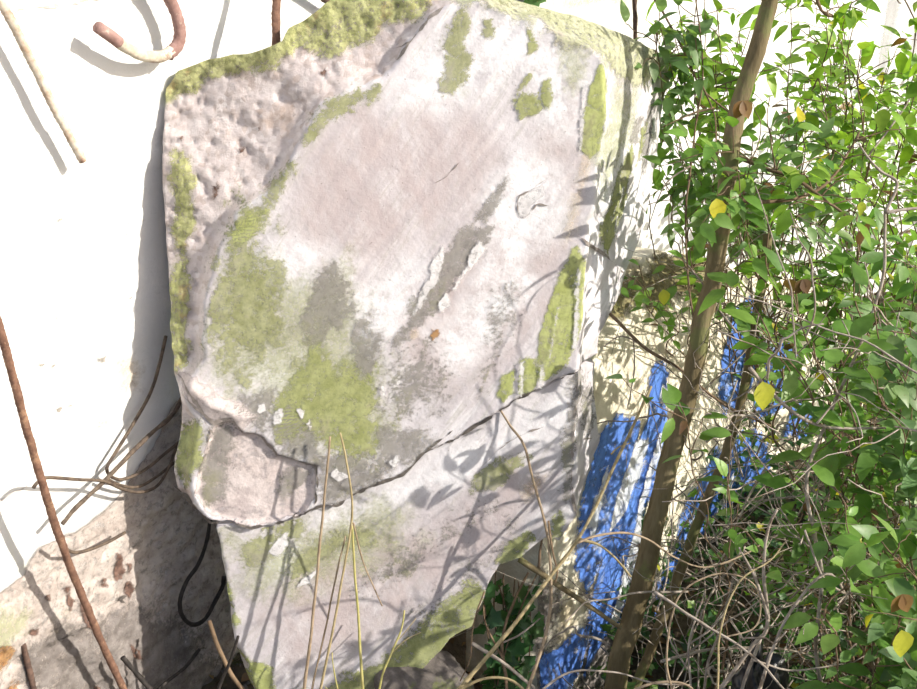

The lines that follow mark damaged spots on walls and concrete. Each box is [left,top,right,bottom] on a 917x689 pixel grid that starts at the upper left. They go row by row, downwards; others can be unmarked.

spalling [271,0,281,45]
spalling [0,0,87,164]
crack [174,361,591,530]
peeling [331,469,348,481]
spalling [0,316,316,689]
rust [102,553,135,598]
rust [64,587,91,629]